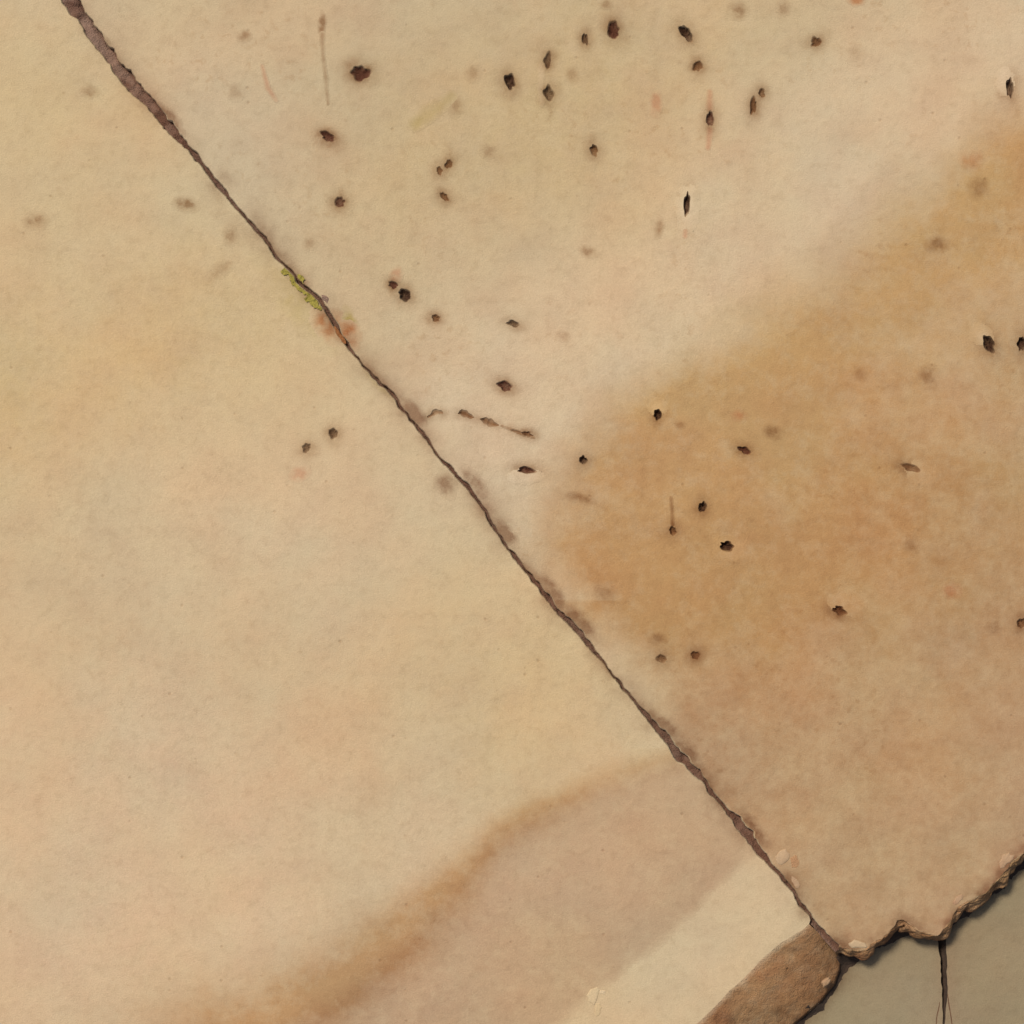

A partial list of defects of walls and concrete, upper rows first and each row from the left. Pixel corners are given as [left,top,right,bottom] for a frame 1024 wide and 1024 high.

leakage [956,147,992,204]
leakage [921,234,953,255]
leakage [914,362,942,392]
crack [62,0,840,952]
leakage [559,489,599,506]
leakage [56,742,756,1024]
spalling [697,849,1024,1024]